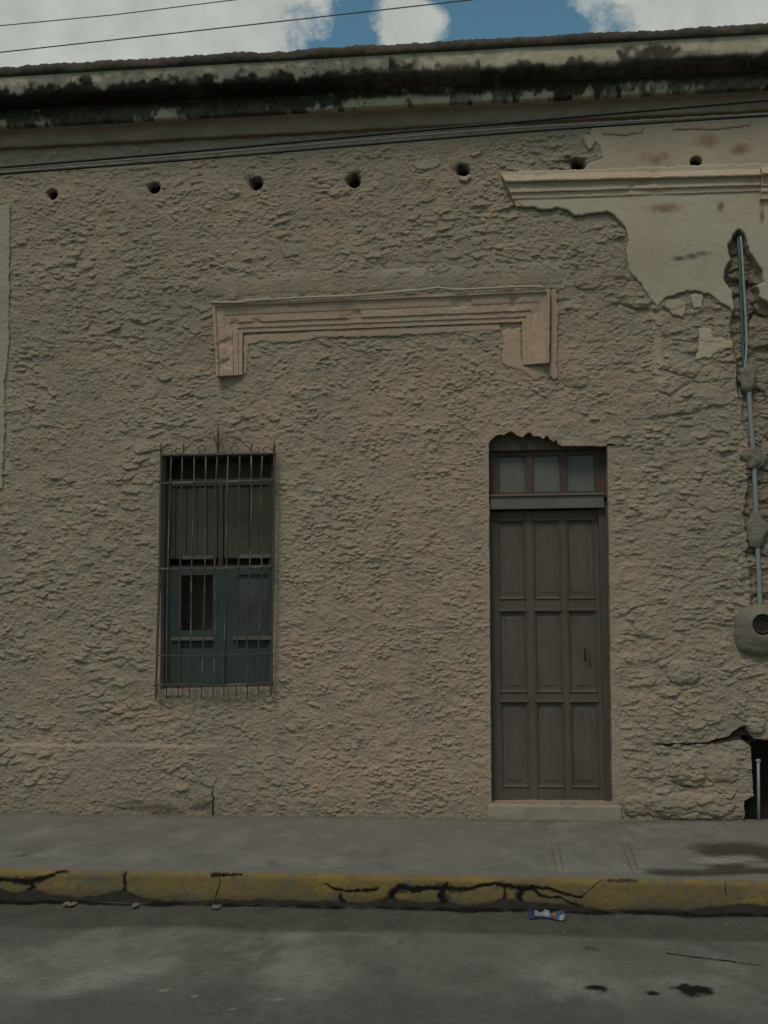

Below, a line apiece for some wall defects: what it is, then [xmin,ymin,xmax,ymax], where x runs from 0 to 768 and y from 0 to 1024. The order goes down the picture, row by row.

mould [0,43,768,129]
flaking render [501,111,768,175]
flaking render [507,189,768,607]
spalling [482,422,568,447]
crack [658,738,719,746]
crack [0,869,69,890]
crack [211,872,243,897]
crack [324,879,638,907]